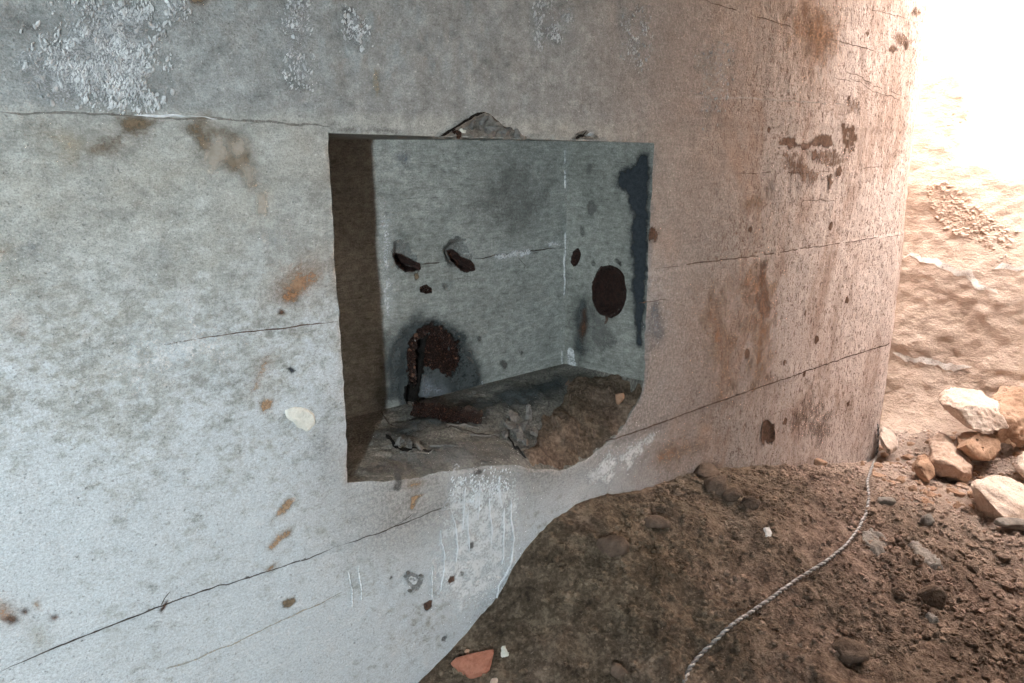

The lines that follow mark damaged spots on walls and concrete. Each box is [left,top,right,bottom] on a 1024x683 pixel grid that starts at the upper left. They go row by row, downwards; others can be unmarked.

spalling [432,112,527,140]
water stain [827,123,858,189]
water stain [616,153,651,347]
crack [657,235,897,269]
crack [153,322,331,347]
crack [601,343,889,443]
crack [2,498,466,671]